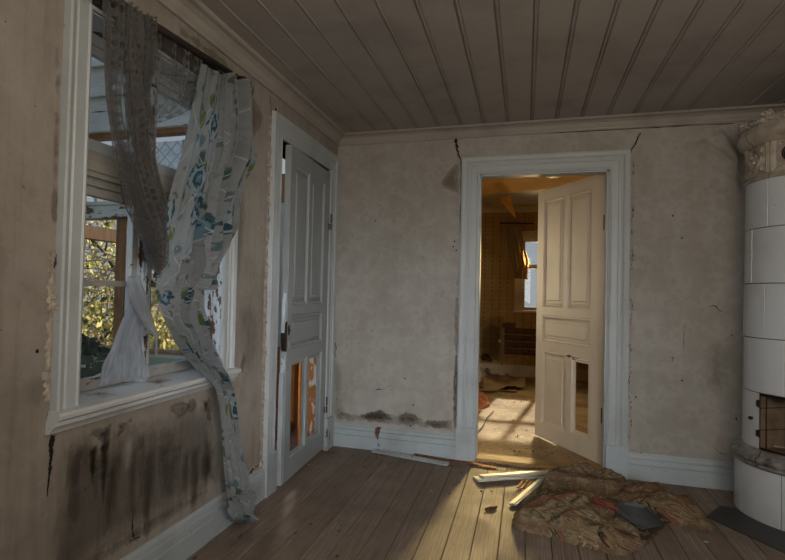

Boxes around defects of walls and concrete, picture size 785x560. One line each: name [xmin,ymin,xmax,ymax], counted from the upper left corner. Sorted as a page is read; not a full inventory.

crack [452,139,461,160]
crack [561,123,735,151]
crack [47,435,55,497]
water stain [90,429,110,490]